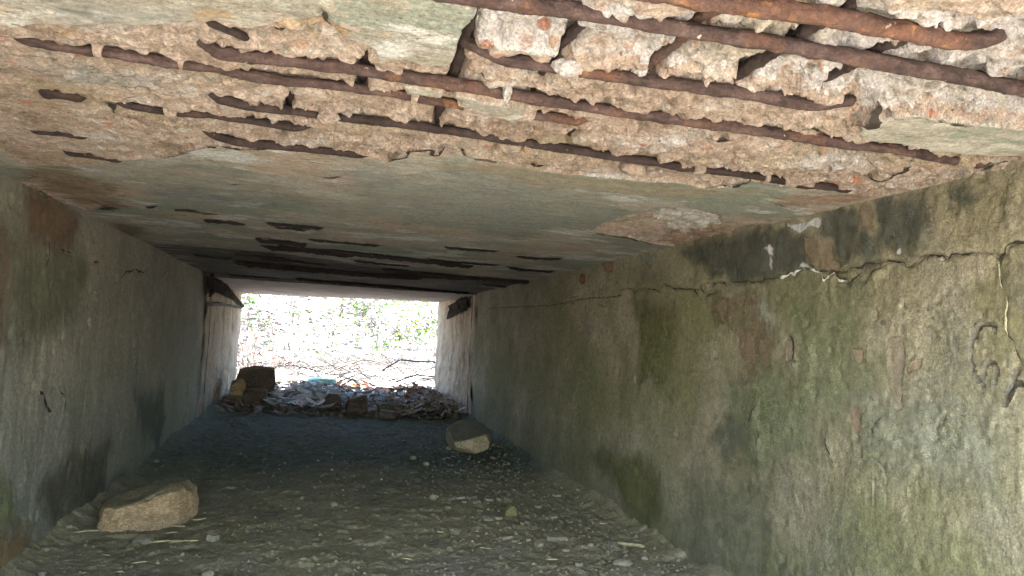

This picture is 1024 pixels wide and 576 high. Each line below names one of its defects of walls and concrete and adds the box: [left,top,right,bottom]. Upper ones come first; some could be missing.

spalling [0,0,1024,210]
spalling [593,207,767,246]
leakage [658,194,925,283]
crack [467,240,1024,417]
leakage [984,263,1024,339]
leakage [674,488,767,569]